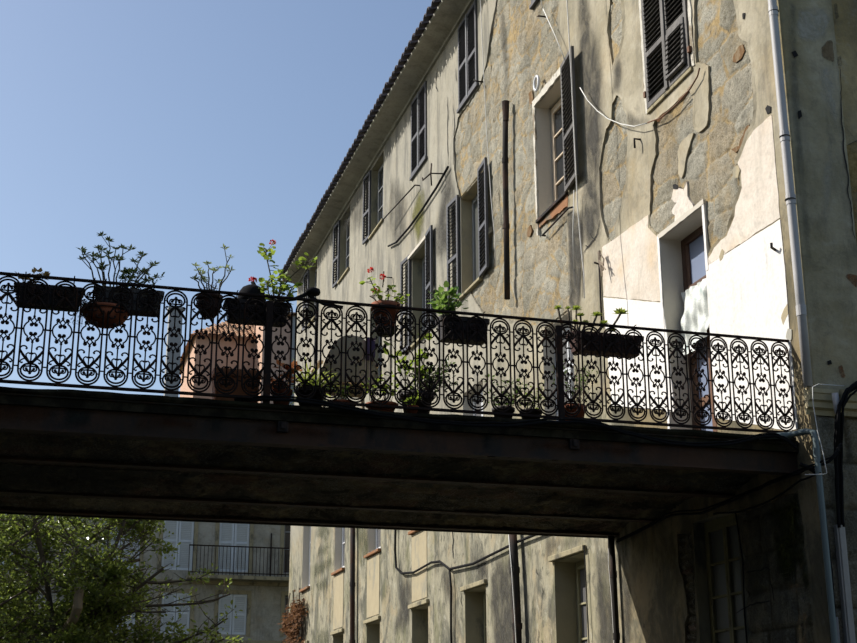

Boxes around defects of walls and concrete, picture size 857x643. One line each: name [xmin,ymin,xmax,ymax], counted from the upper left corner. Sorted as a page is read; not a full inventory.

damp [568,0,600,306]
spalling [598,93,629,241]
spalling [607,0,625,69]
spalling [648,0,771,261]